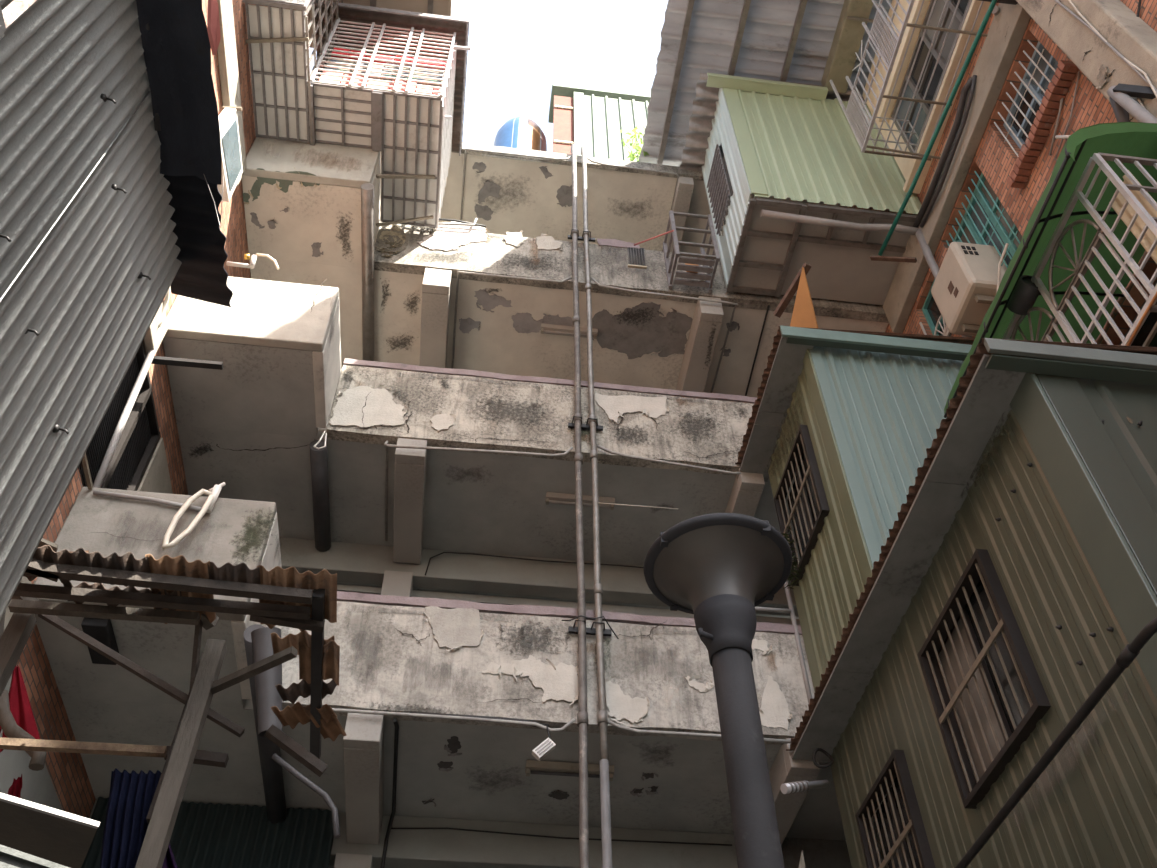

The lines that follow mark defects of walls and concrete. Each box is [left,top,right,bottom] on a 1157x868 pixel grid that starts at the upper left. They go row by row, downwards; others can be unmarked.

spalling [375,162,501,258]
peeling [504,230,563,251]
peeling [594,391,670,423]
damp [234,510,278,565]
peeling [424,606,484,651]
spalling [482,655,579,705]
spalling [605,675,650,725]
spalling [684,675,713,692]
peeling [759,675,792,730]